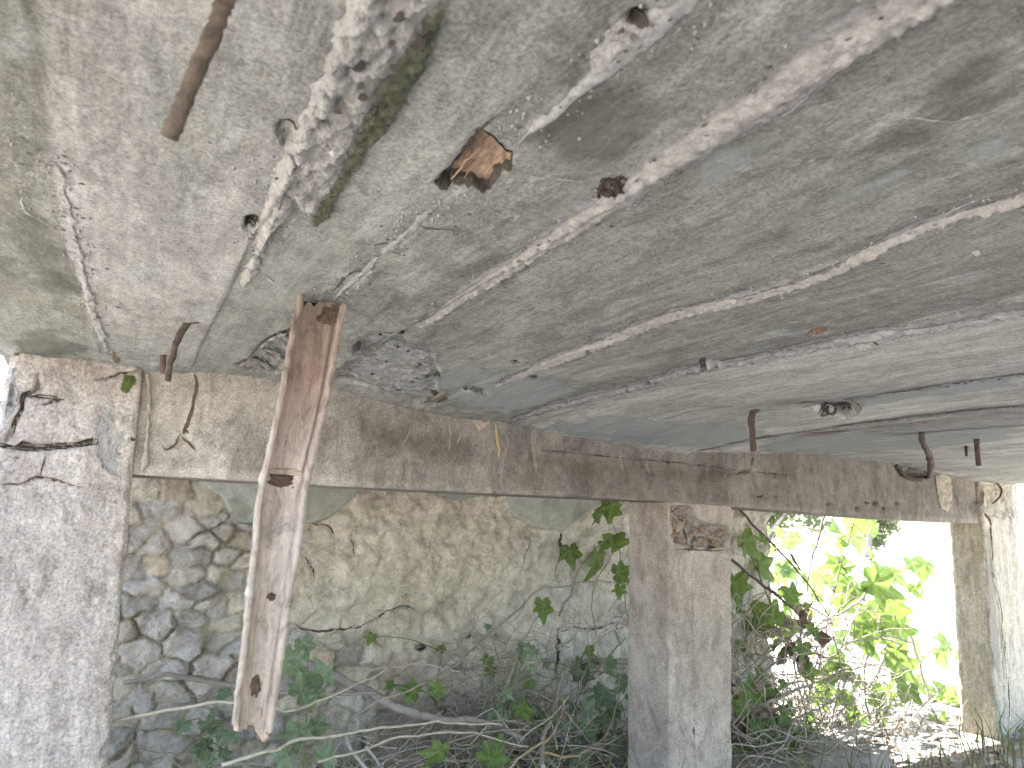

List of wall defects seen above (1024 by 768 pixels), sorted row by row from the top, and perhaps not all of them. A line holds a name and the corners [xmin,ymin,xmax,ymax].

spalling [276,119,295,148]
water stain [556,102,614,151]
spalling [434,111,513,193]
rust [597,175,627,200]
spalling [245,214,258,227]
spalling [795,401,860,417]
crack [1,455,85,488]
spalling [670,505,731,551]